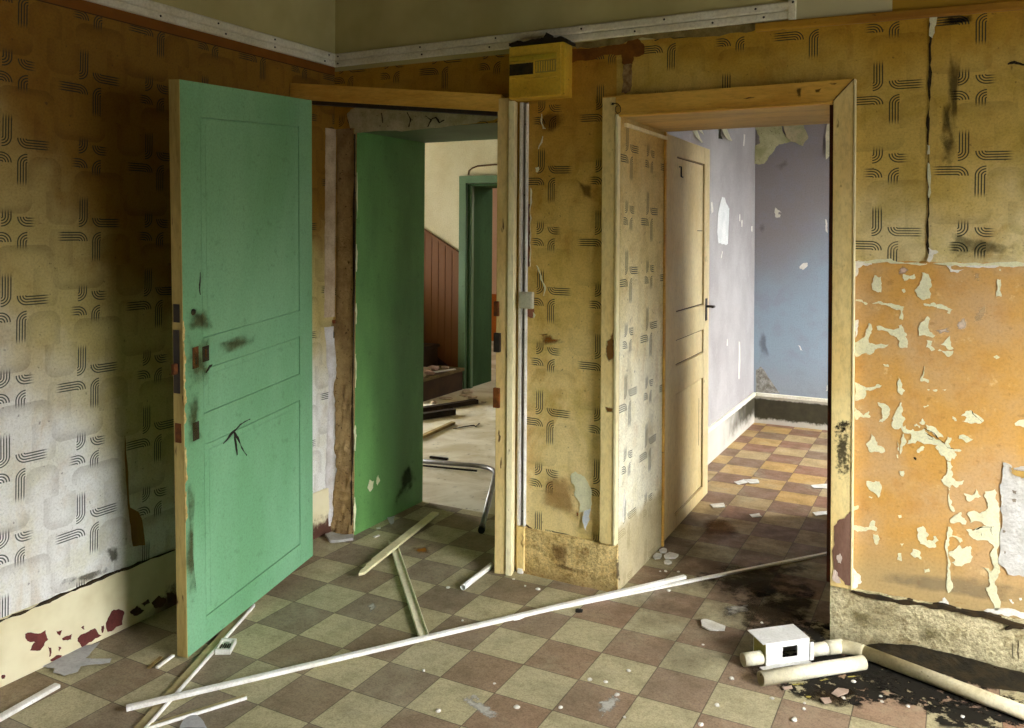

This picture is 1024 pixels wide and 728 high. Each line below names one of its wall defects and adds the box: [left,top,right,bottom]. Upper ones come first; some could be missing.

peeling [718,125,808,164]
peeling [711,197,753,258]
peeling [855,248,1024,357]
water stain [836,421,849,474]
peeling [124,439,145,546]
peeling [570,472,592,530]
flaking render [854,379,1024,619]
peeling [25,592,176,661]